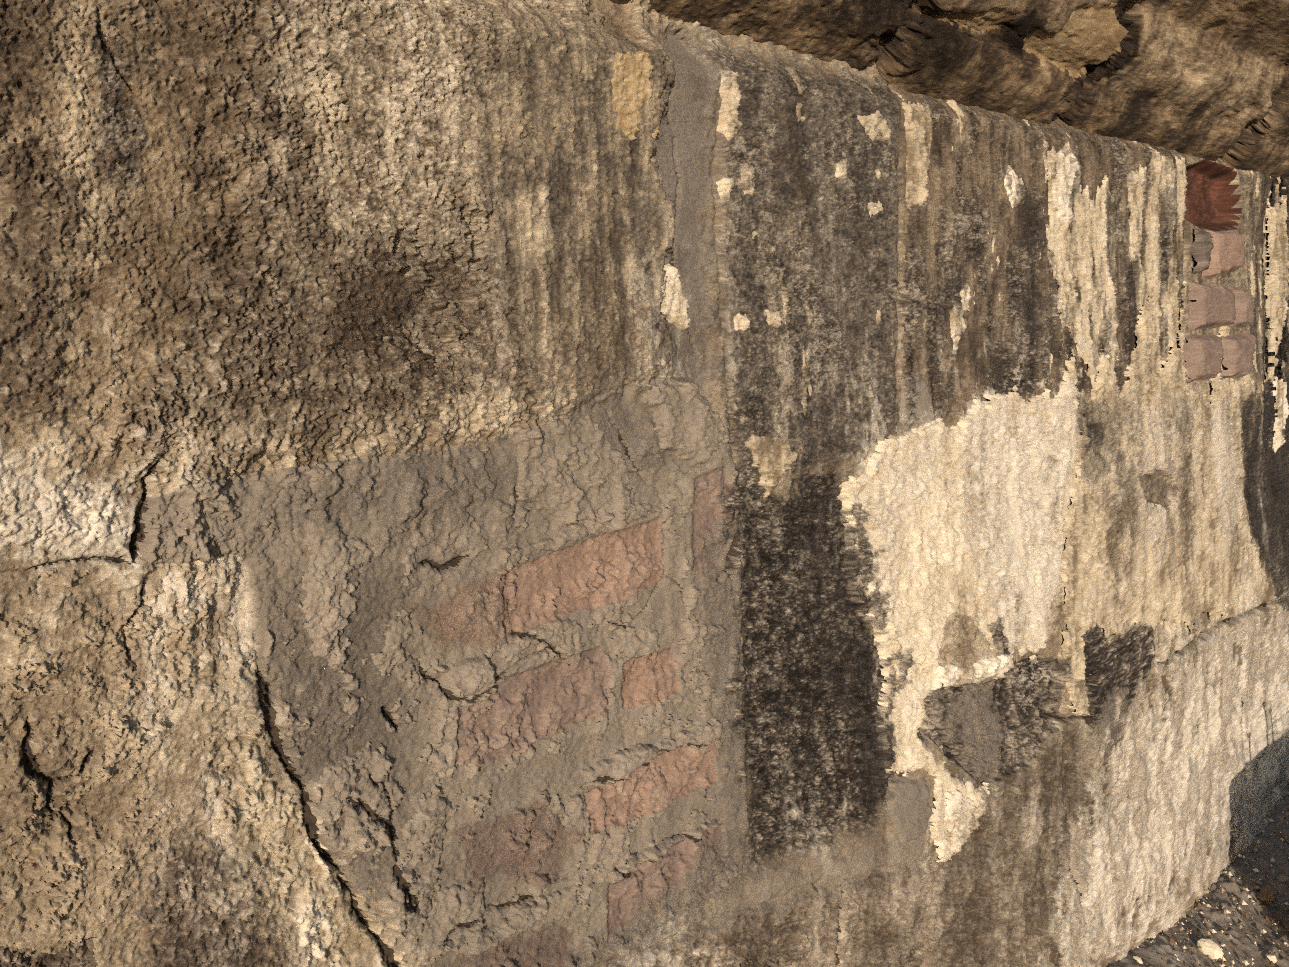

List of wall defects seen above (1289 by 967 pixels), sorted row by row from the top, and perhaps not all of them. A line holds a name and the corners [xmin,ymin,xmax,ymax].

peeling [716,52,743,140]
damp [722,199,878,461]
damp [791,0,1185,616]
flaking render [835,133,1289,862]
flaking render [7,716,169,929]
damp [139,846,281,967]
crack [256,671,399,967]
flaking render [80,390,673,967]
crack [347,774,420,914]
crack [445,878,559,947]
damp [815,630,896,815]
crack [1041,713,1104,725]